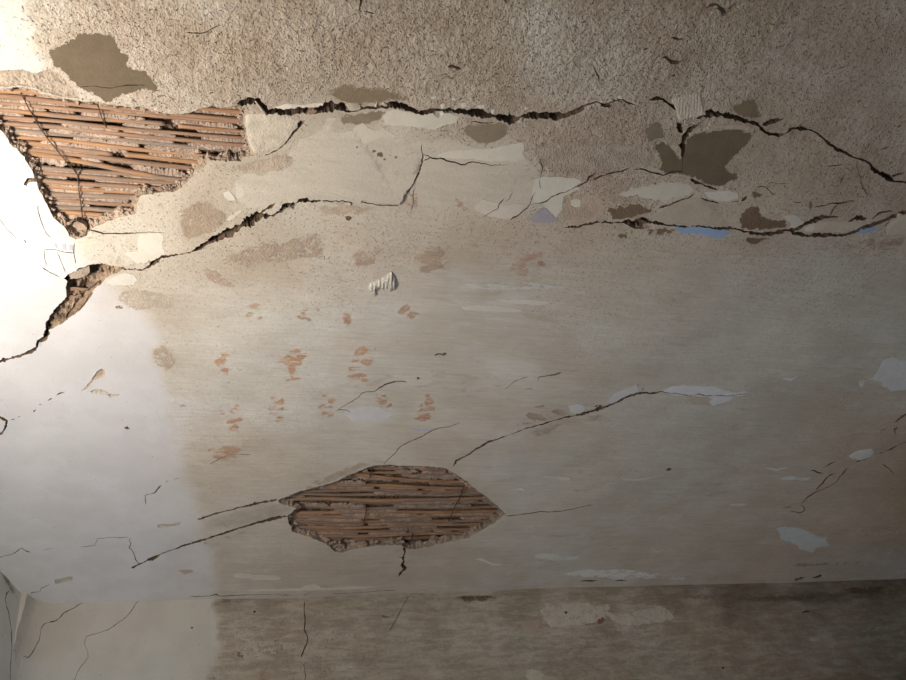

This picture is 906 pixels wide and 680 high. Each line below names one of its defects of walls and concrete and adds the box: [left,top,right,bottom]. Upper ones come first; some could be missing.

peeling [0,69,211,116]
flaking render [0,103,293,239]
crack [237,65,906,238]
crack [453,388,745,466]
crack [785,414,906,513]
crack [83,499,287,568]
flaking render [211,469,506,553]
peeling [776,526,859,567]
crack [190,591,281,599]
crack [300,603,308,679]